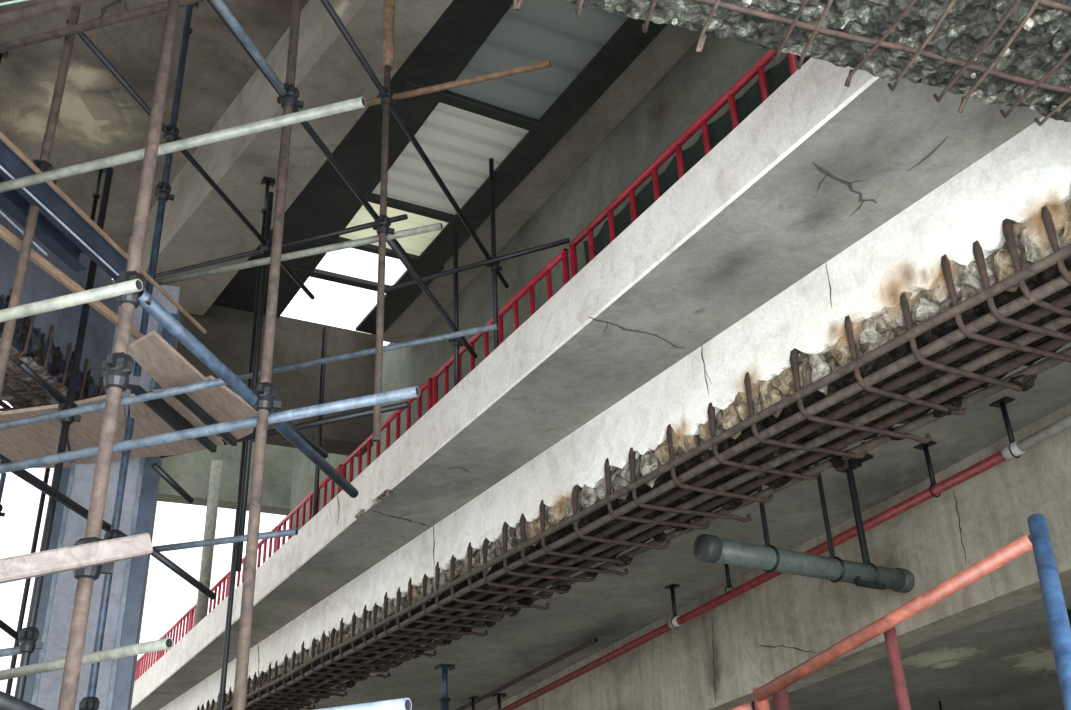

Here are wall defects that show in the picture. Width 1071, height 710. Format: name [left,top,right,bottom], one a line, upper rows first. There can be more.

peeling [334,0,350,18]
spalling [566,0,1071,122]
crack [812,162,877,217]
rust [883,282,901,304]
crack [589,317,711,394]
spalling [209,199,1071,710]